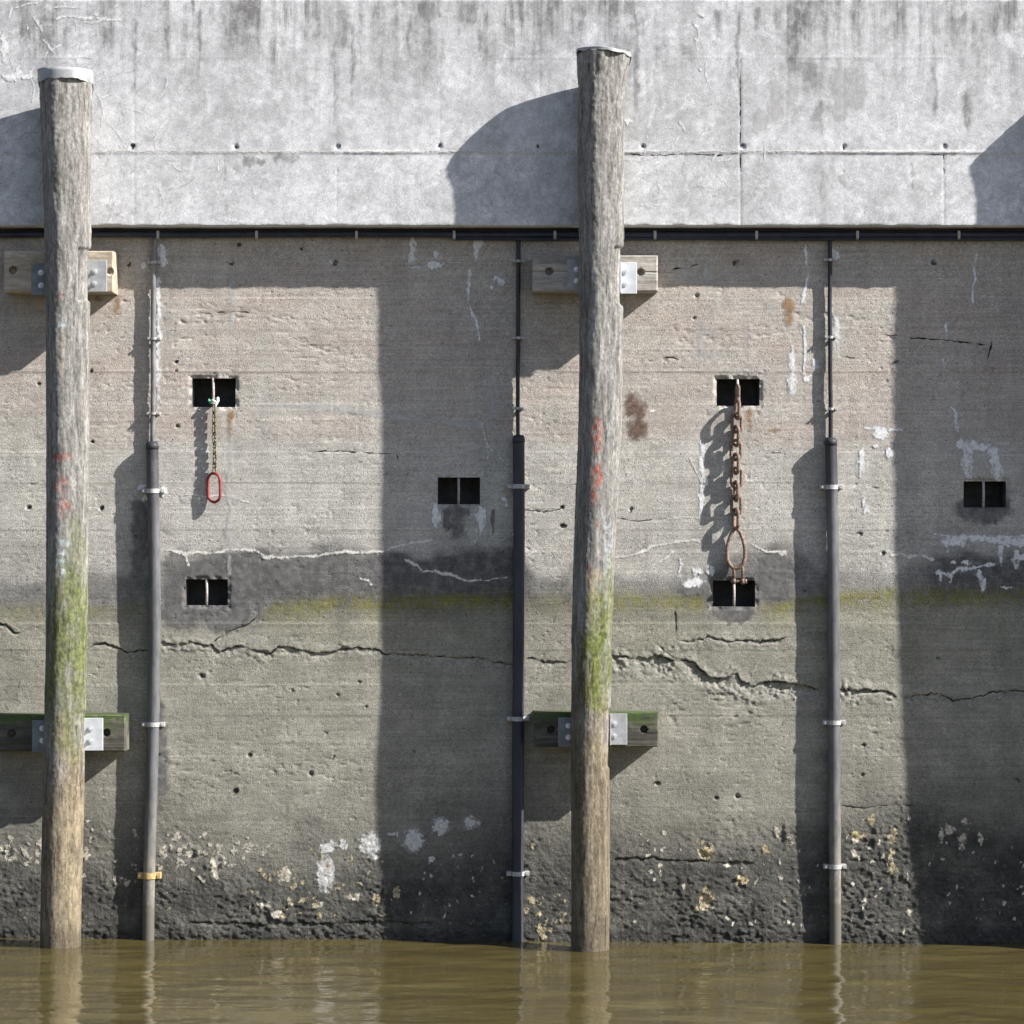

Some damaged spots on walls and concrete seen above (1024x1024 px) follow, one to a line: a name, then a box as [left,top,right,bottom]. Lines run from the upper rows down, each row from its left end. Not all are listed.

damp [53,0,124,30]
damp [0,2,92,155]
damp [92,70,459,187]
damp [625,81,967,208]
crack [885,321,992,371]
corrosion [625,394,648,440]
damp [950,406,1005,481]
crack [166,539,508,585]
damp [930,498,1024,592]
crack [88,617,570,670]
crack [611,611,1024,709]